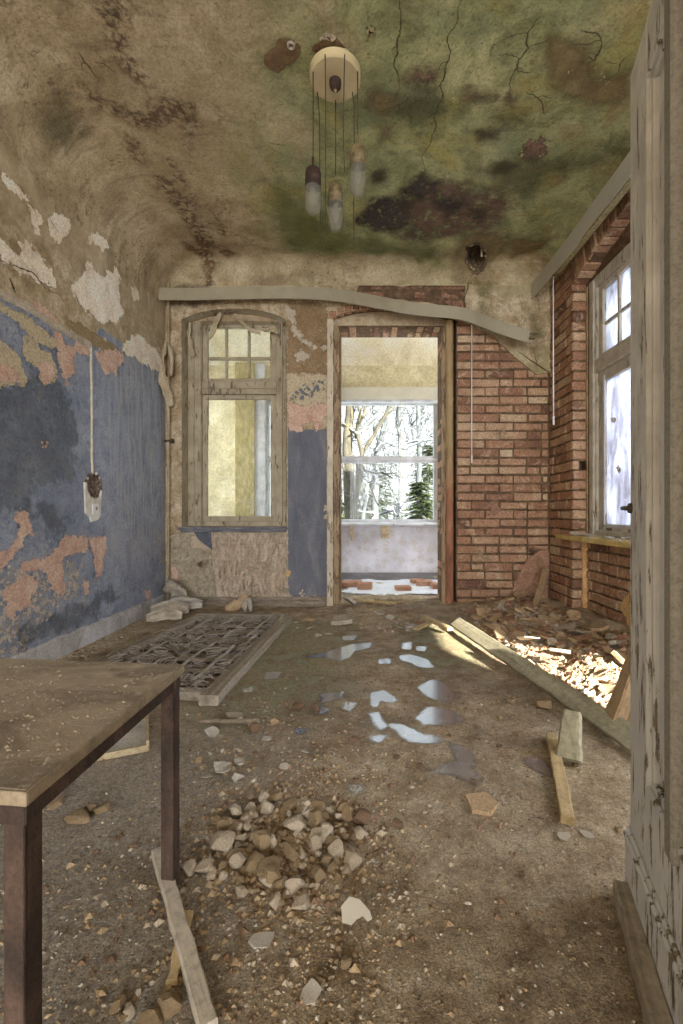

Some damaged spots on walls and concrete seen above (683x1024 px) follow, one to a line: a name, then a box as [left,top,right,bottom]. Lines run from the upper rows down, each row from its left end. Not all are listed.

peeling [0,261,161,392]
spalling [85,471,102,499]
peeling [0,510,108,657]